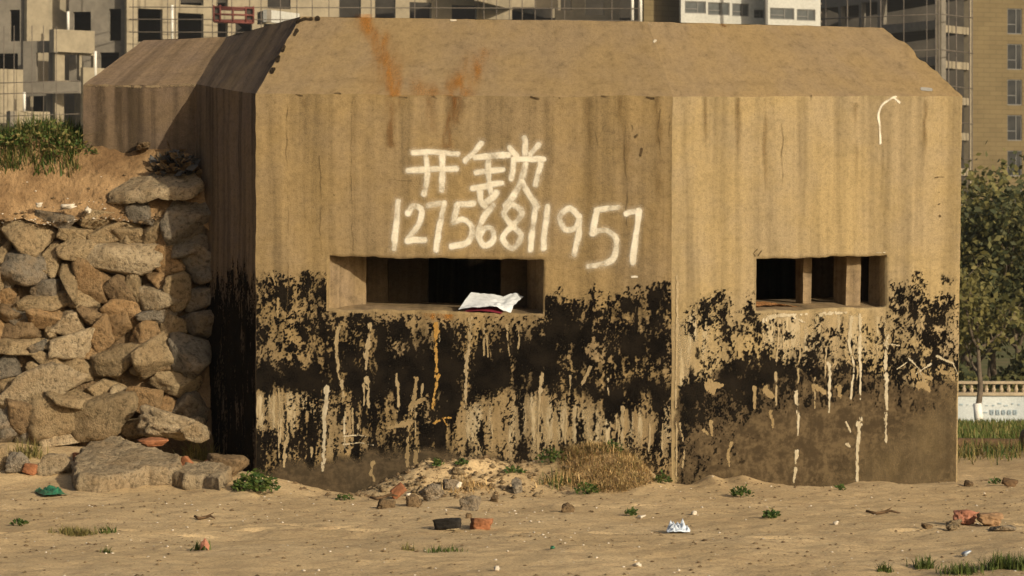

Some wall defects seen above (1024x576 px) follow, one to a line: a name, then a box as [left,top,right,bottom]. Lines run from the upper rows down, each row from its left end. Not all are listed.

leakage [203,259,959,494]